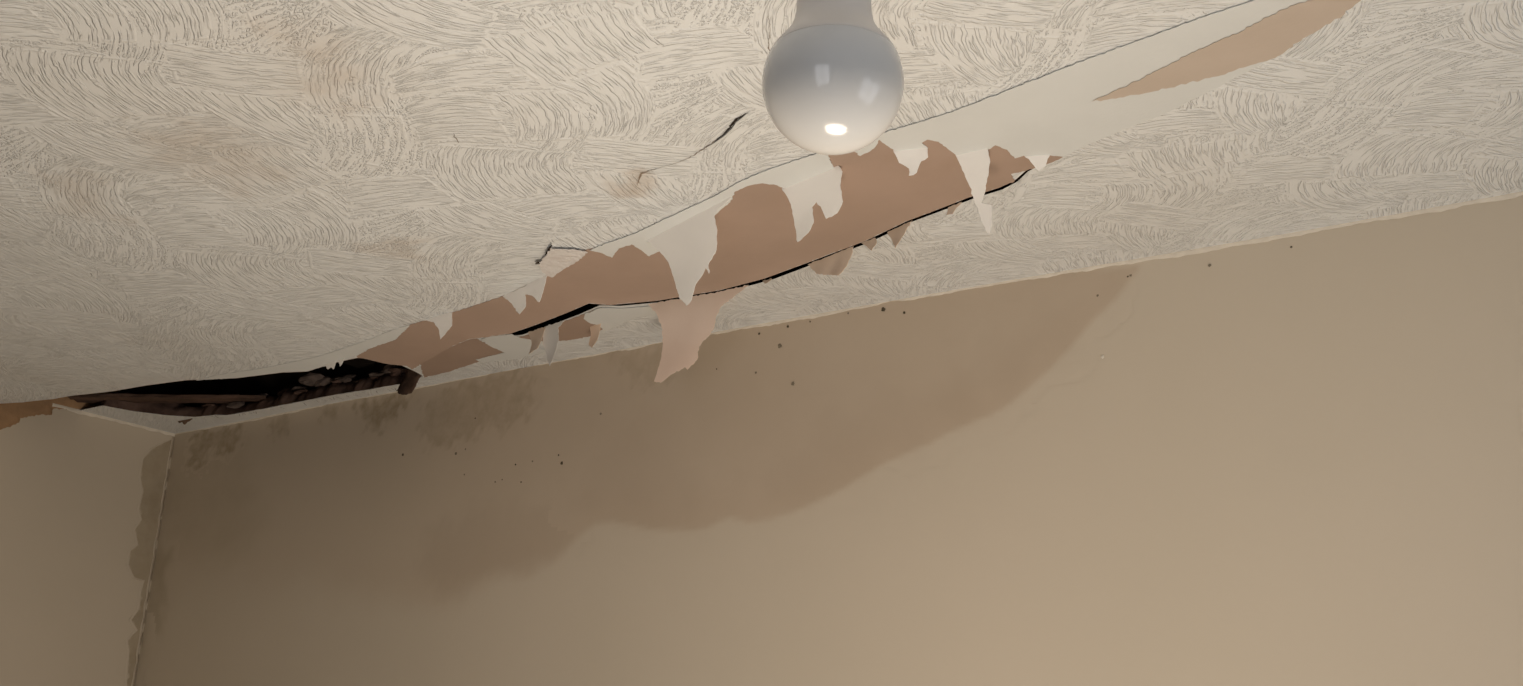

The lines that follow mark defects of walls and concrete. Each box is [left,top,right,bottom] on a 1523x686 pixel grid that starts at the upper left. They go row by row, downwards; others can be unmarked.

peeling [199,0,1361,383]
flaking render [0,390,120,430]
damp [134,261,1145,686]